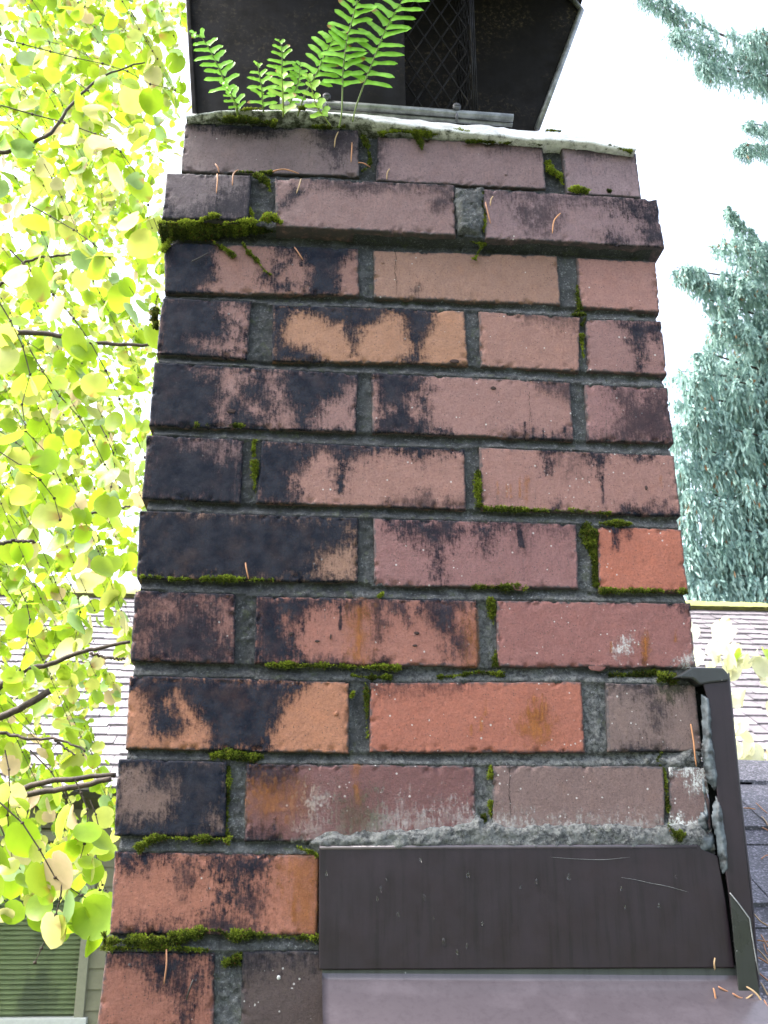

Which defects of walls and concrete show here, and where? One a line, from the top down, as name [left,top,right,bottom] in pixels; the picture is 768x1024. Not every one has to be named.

water stain [517,524,525,548]